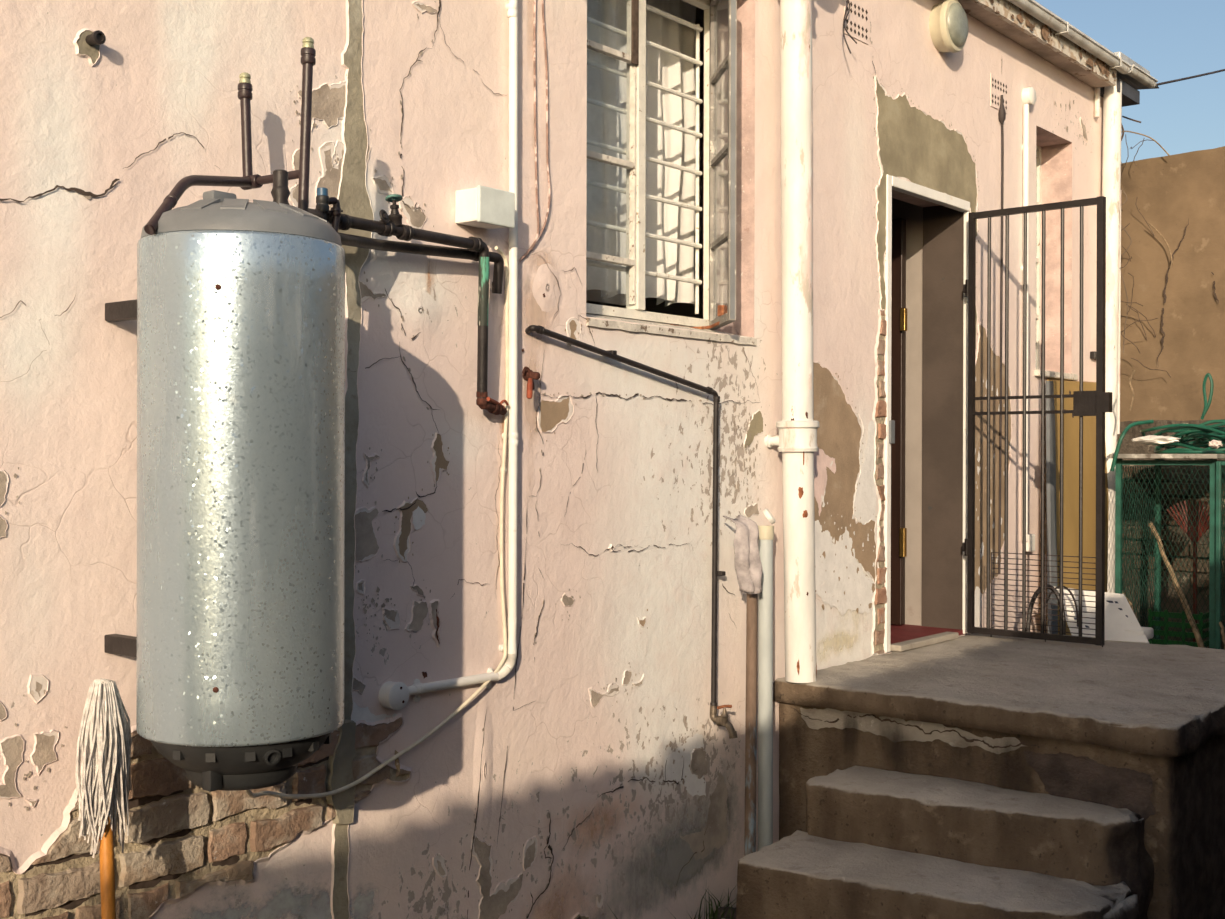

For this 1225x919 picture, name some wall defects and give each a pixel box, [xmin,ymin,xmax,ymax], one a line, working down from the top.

crack [0,132,217,203]
peeling [289,74,347,210]
crack [398,0,507,214]
peeling [534,392,576,442]
peeling [813,75,979,656]
peeling [354,432,450,647]
crack [451,323,760,919]
peeling [0,701,66,811]
flaking render [0,725,340,919]
flaking render [351,668,412,804]
peeling [470,833,543,919]
spalling [800,708,1156,822]